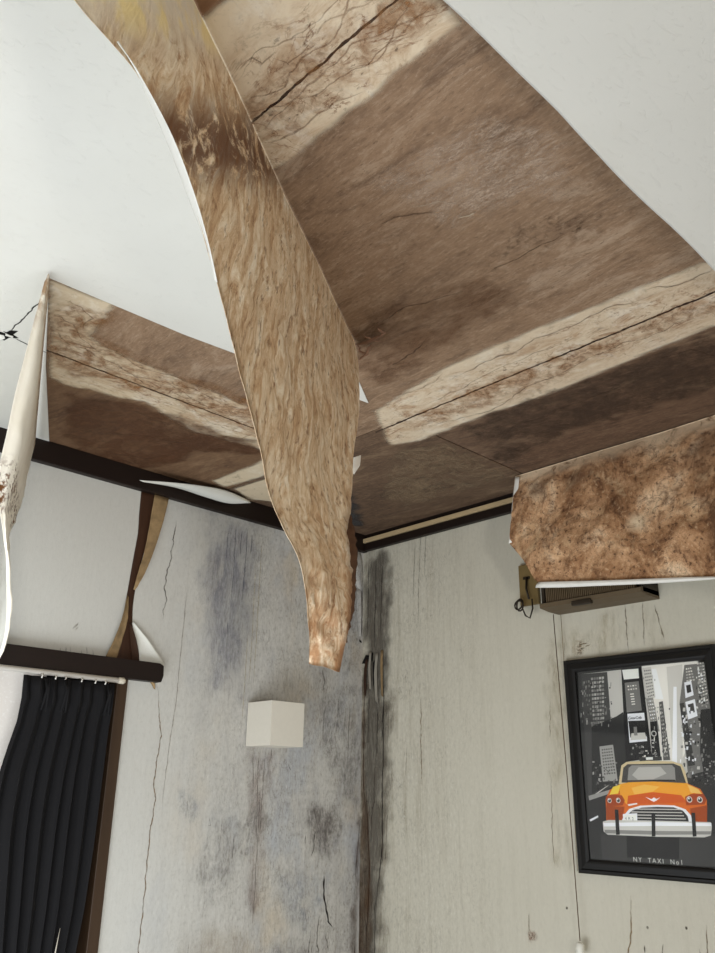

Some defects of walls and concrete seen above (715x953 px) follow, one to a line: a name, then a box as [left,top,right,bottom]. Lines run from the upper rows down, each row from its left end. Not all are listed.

crack [254,0,399,121]
crack [0,303,254,429]
damp [388,340,715,502]
crack [138,693,162,953]
damp [359,552,391,953]